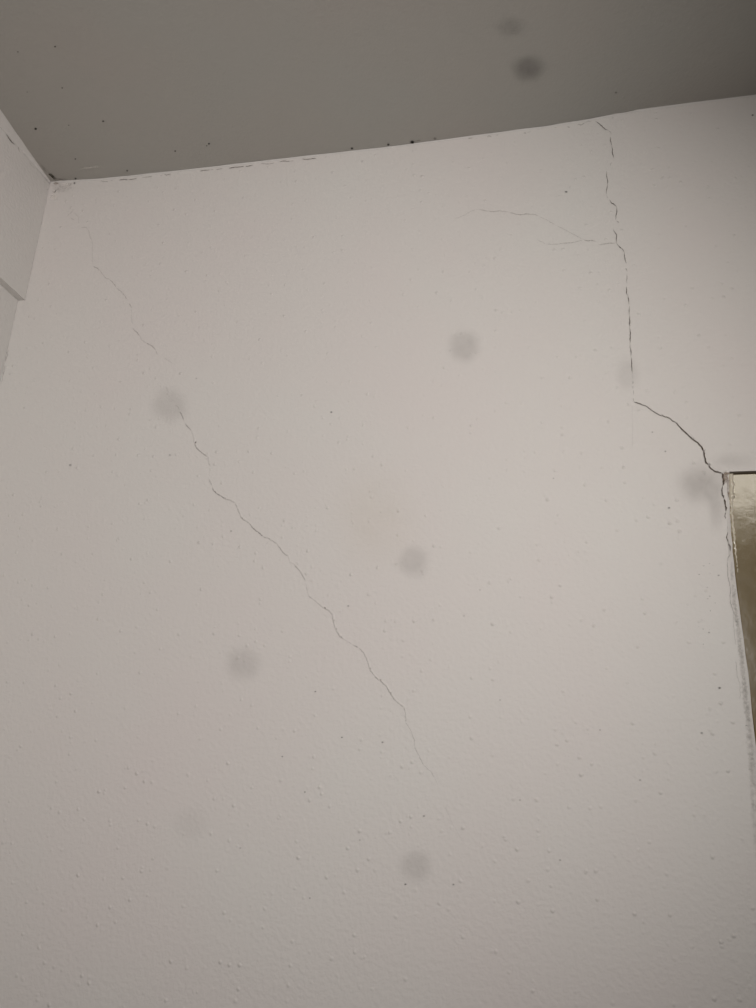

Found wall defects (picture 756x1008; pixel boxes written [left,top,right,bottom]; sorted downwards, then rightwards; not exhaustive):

crack [635,400,731,550]